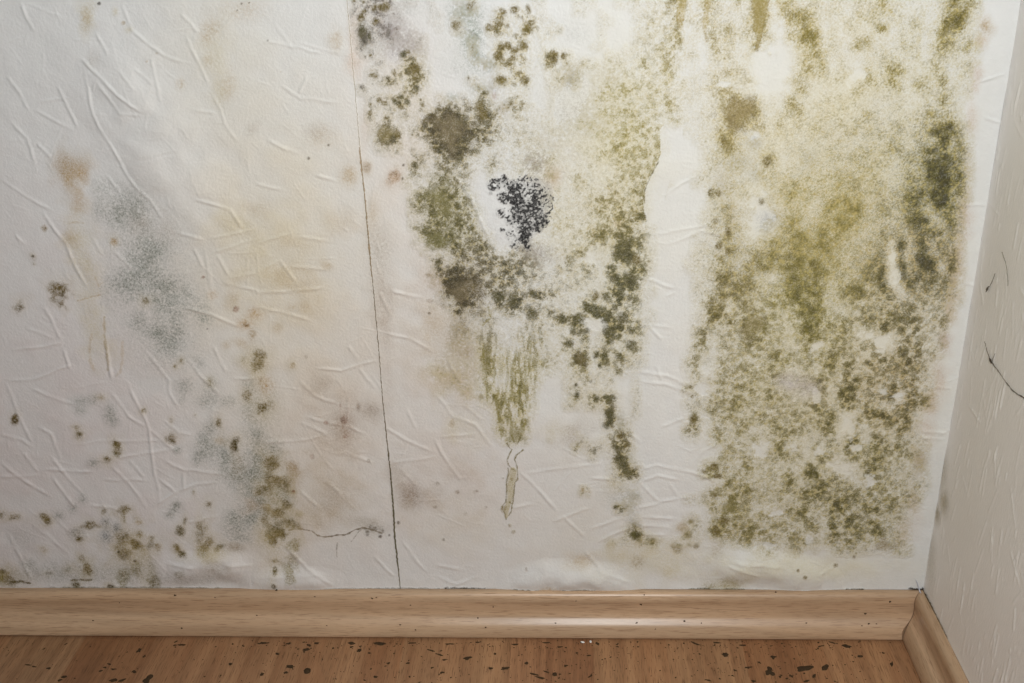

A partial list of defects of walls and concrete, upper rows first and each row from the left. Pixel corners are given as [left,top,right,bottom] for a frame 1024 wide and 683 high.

damp [193,0,275,116]
damp [323,0,491,195]
damp [462,0,690,270]
damp [0,74,660,590]
damp [534,0,1000,591]
crack [984,341,1024,398]